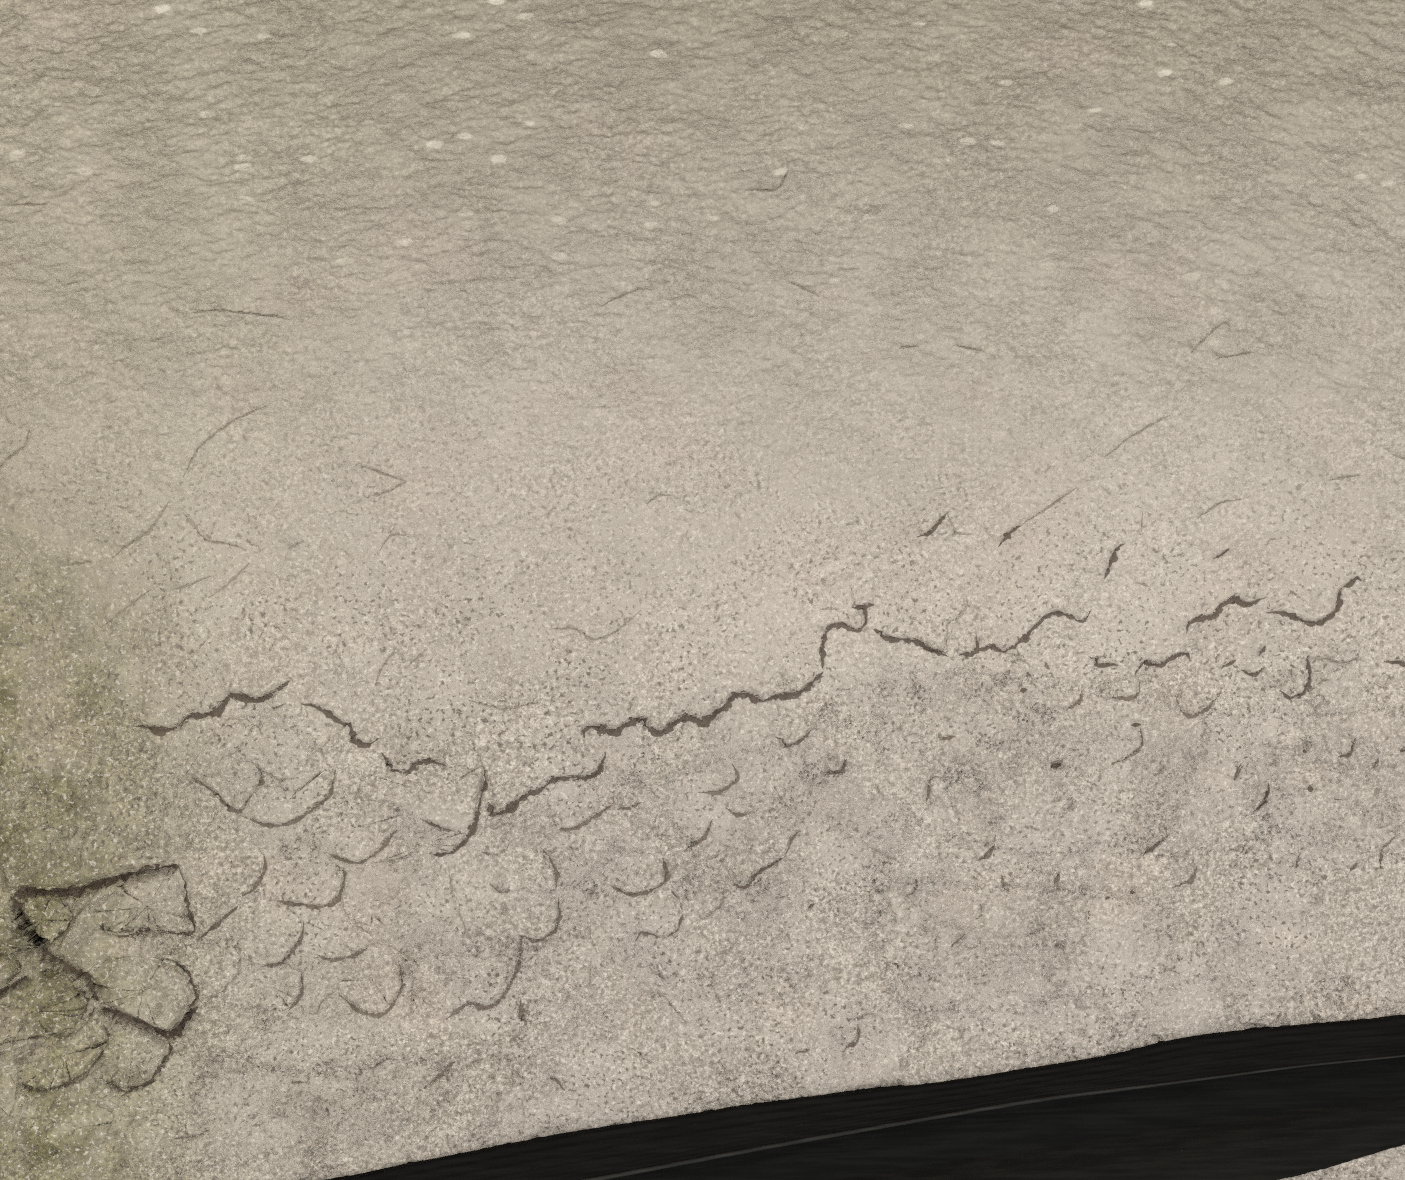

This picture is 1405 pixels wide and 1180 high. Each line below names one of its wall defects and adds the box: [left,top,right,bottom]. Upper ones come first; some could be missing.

crack [135,680,445,776]
crack [375,649,427,685]
crack [487,601,1091,817]
crack [1090,576,1405,700]
crack [0,864,198,1040]
crack [122,1080,157,1096]